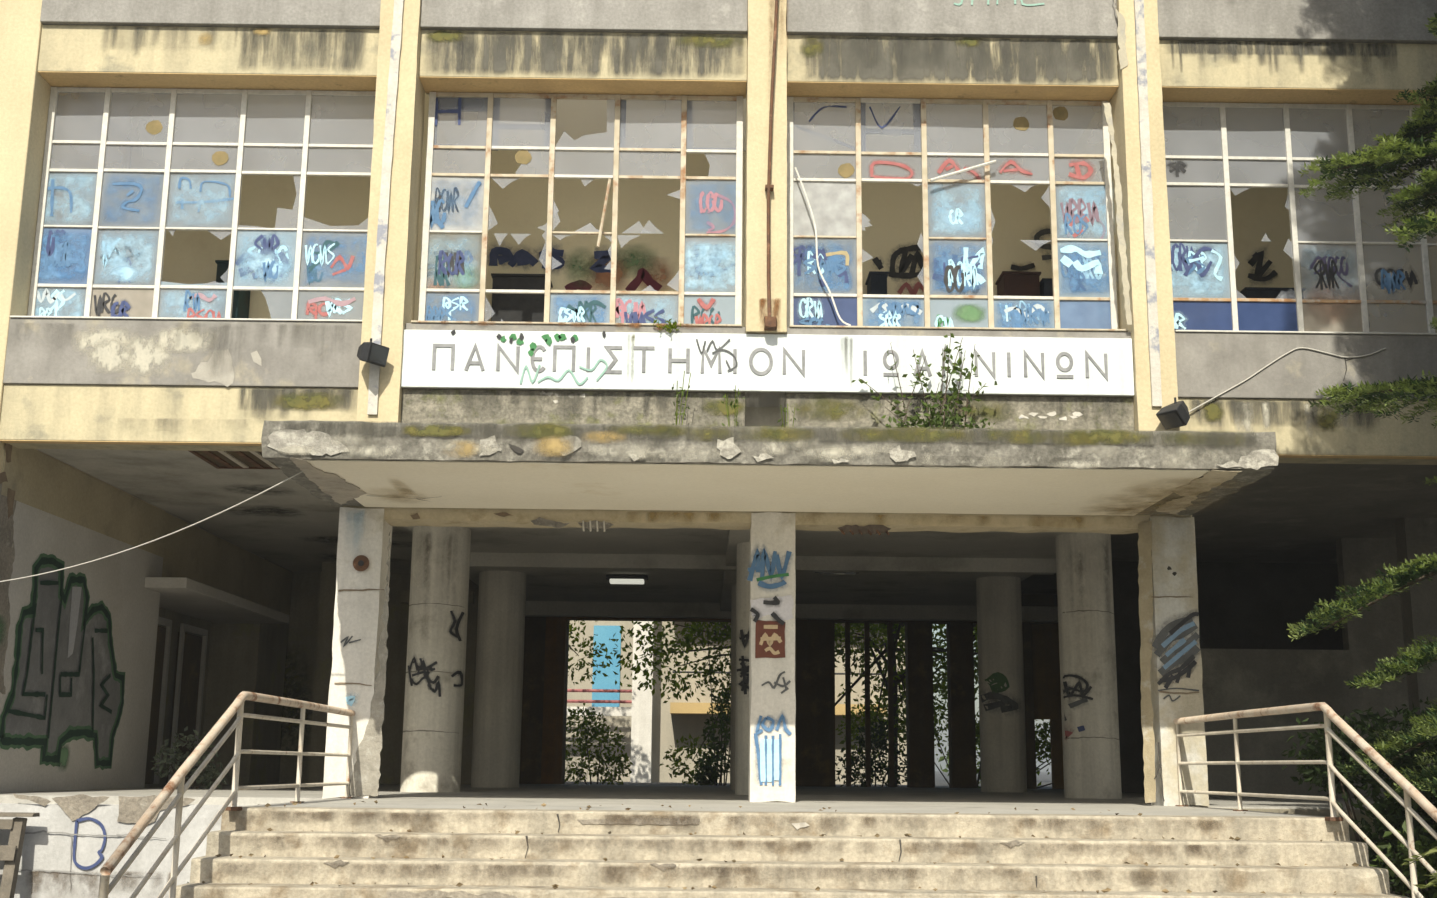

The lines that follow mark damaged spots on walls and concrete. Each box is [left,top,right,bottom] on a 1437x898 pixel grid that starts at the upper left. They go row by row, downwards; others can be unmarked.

leakage [429,31,741,75]
leakage [803,37,1111,83]
leakage [1171,41,1393,65]
peeling [78,328,234,387]
peeling [251,351,262,366]
spalling [479,435,524,456]
spalling [547,434,581,456]
spalling [626,450,646,461]
spalling [717,437,774,462]
spalling [889,445,916,462]
spalling [0,444,17,694]